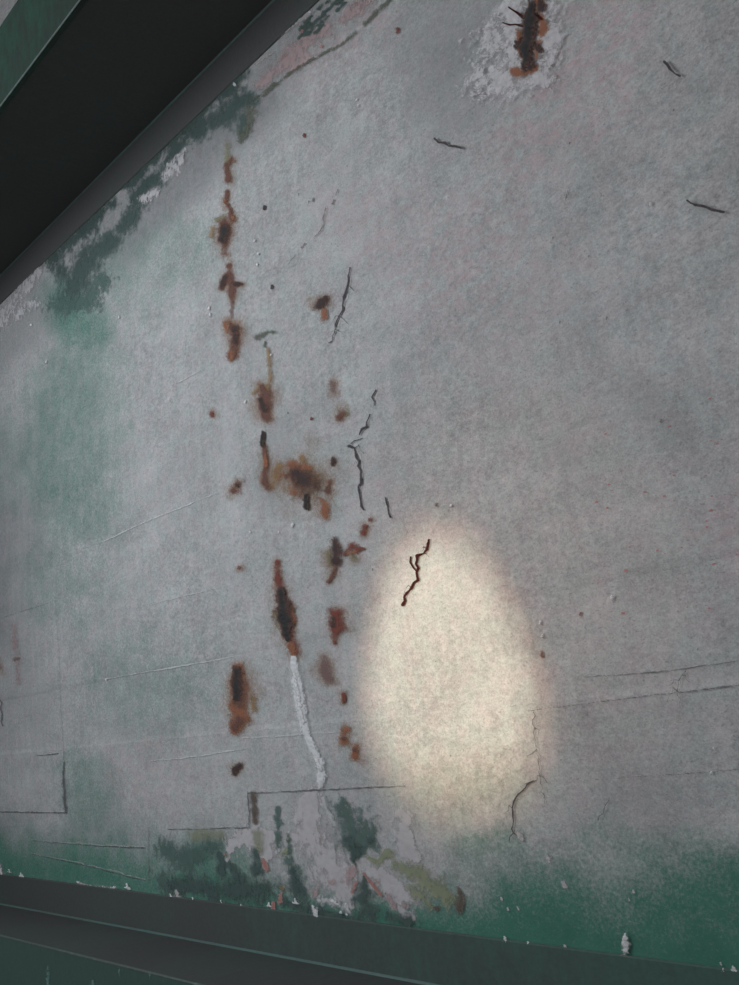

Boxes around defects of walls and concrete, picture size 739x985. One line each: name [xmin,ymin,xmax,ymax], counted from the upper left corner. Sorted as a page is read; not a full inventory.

corrosion [209,144,243,361]
crack [329,267,354,343]
corrosion [252,348,332,519]
crack [347,389,391,518]
corrosion [271,559,299,656]
crack [401,539,430,606]
corrosion [228,663,257,735]
efflorescence [290,656,335,826]
crack [508,712,547,842]
peeling [223,822,281,871]
peeling [267,887,299,909]
peeling [288,786,423,921]